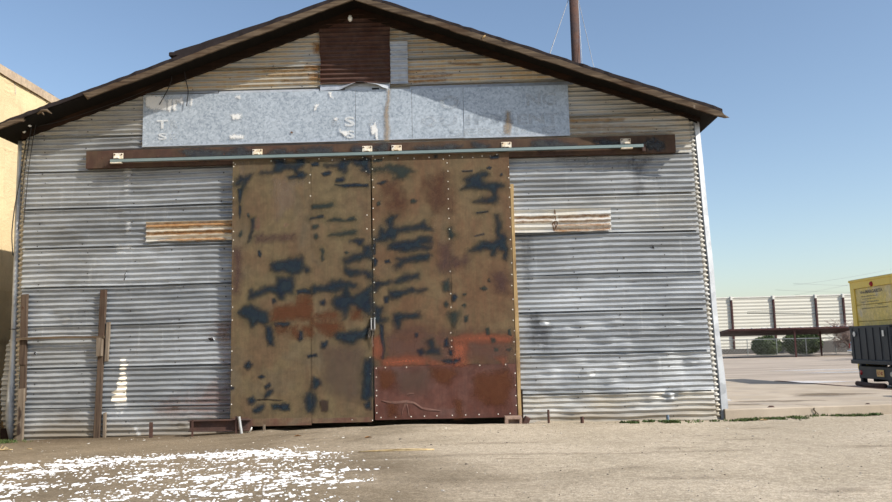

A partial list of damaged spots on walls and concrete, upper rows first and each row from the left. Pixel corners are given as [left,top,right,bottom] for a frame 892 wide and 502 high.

corrosion [146,221,232,241]
corrosion [515,215,610,231]
corrosion [272,295,339,337]